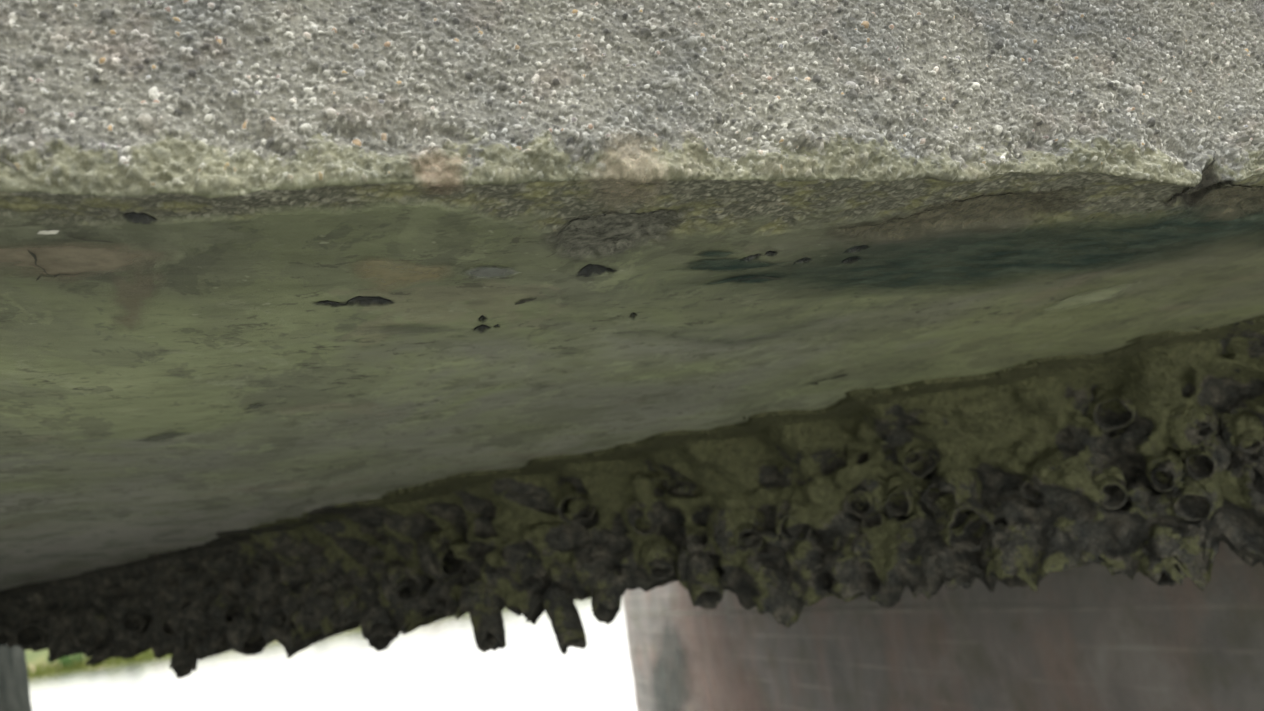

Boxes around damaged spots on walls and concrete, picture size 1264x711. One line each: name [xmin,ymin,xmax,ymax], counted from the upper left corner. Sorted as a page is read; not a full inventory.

spalling [123,212,157,224]
spalling [550,209,684,277]
spalling [1165,161,1264,219]
spalling [315,296,394,307]